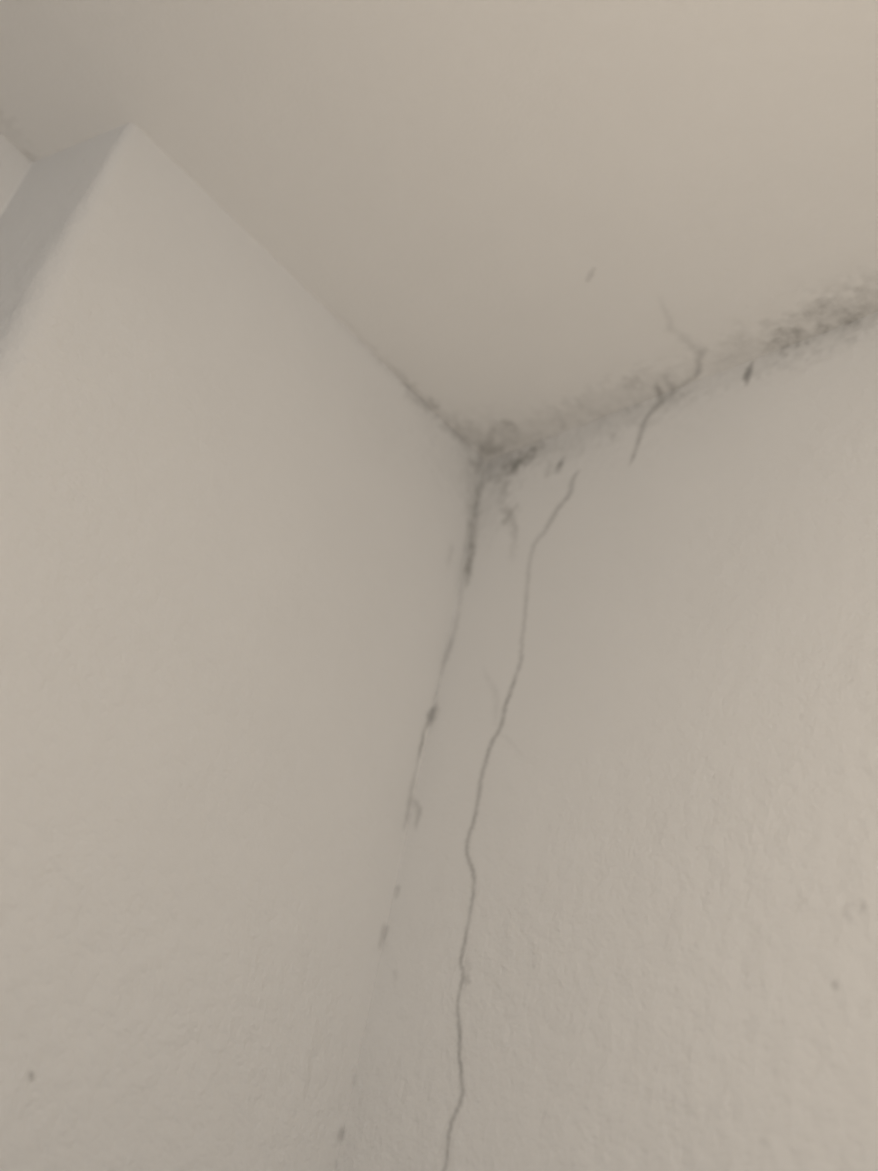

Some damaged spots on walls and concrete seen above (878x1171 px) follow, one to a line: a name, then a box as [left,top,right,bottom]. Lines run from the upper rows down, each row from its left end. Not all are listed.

damp [331,248,878,569]
crack [376,882,403,984]
crack [400,476,485,835]
crack [439,467,583,1171]